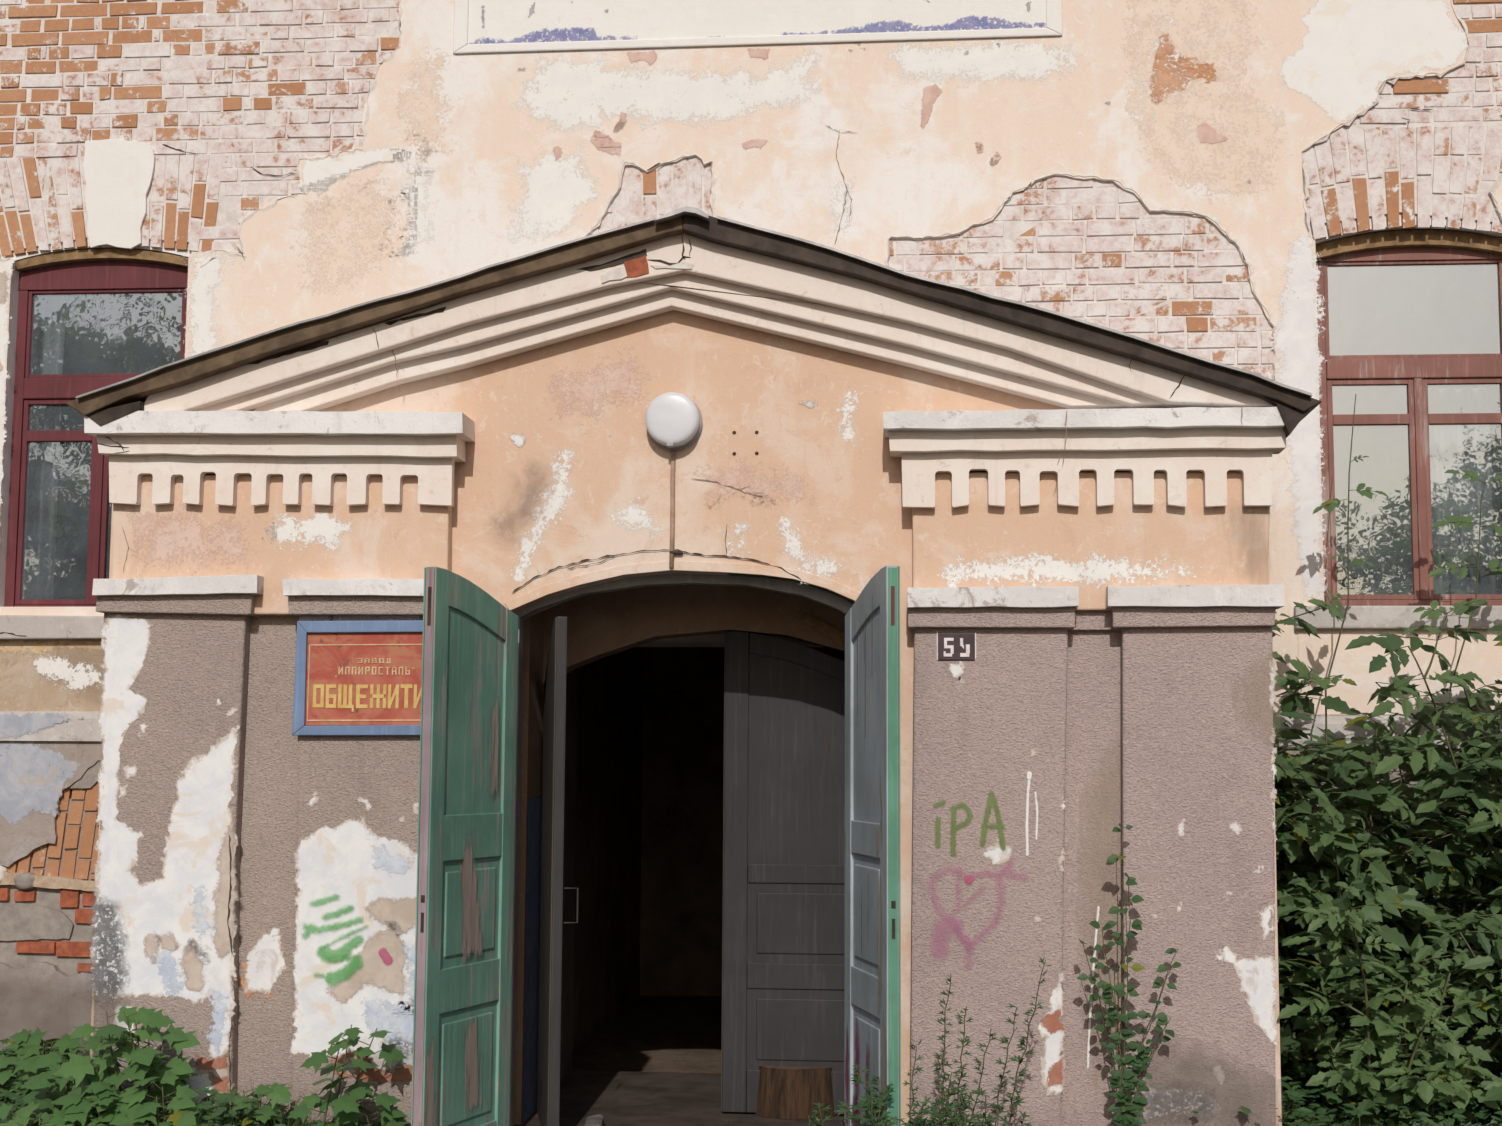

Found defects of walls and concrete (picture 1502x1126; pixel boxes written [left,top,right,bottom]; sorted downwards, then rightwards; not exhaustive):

peeling [497,47,822,244]
crack [828,126,856,243]
flaking render [0,0,462,540]
flaking render [884,0,1502,601]
peeling [121,504,357,577]
peeling [509,448,577,592]
peeling [948,660,966,684]
peeling [0,613,419,1112]
flaking render [1037,971,1066,1096]
peeling [1215,903,1279,1046]